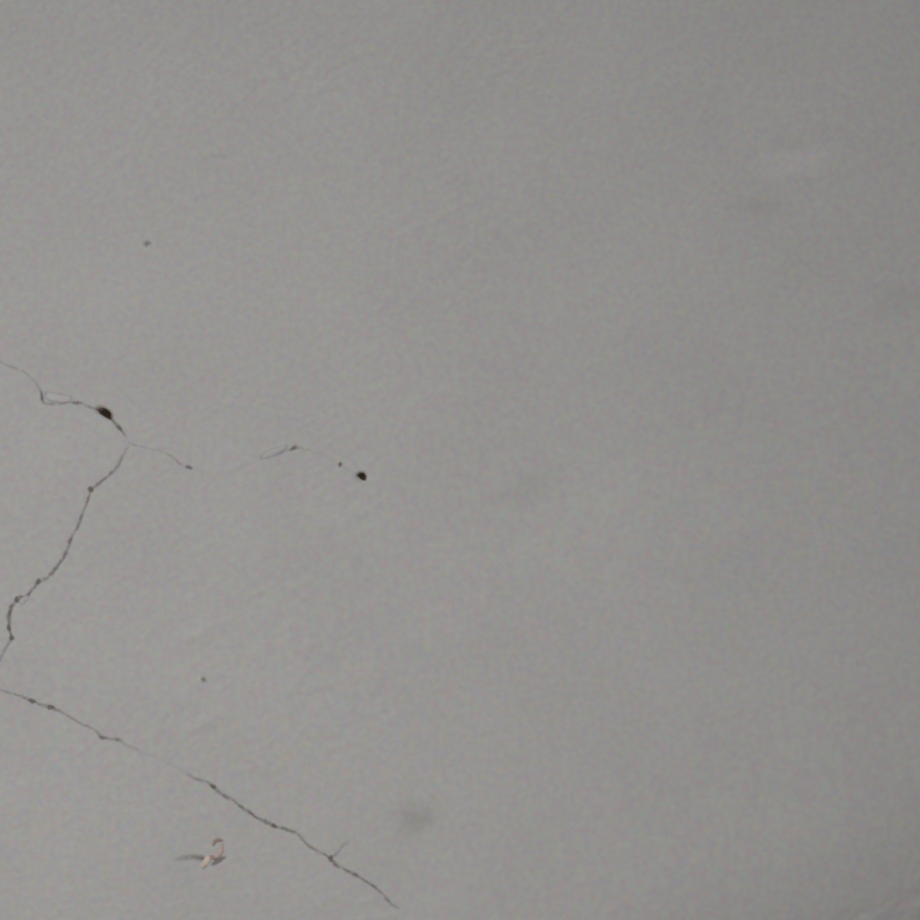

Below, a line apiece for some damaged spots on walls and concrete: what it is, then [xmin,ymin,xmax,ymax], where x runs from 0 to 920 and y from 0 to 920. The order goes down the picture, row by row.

crack [98,407,121,430]
crack [339,463,366,480]
crack [7,472,112,640]